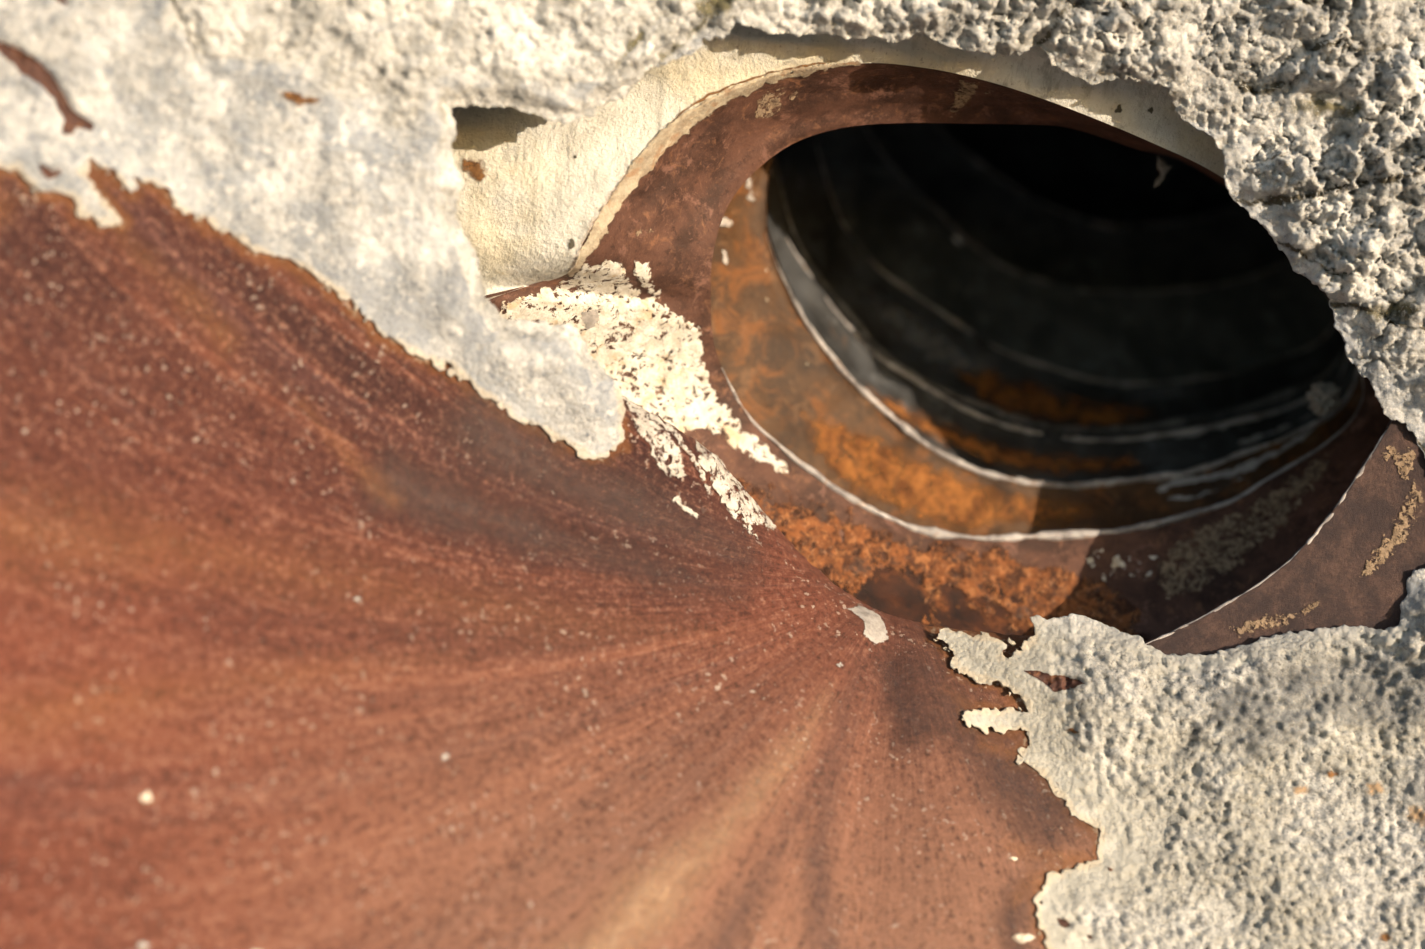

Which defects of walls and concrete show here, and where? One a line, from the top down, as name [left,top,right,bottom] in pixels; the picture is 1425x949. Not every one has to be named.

spalling [0,42,94,134]
rust [670,61,829,124]
peeling [755,88,798,118]
spalling [39,164,62,179]
peeling [499,259,788,540]
rust [882,398,1133,475]
rust [812,422,1084,527]
rust [739,478,1148,641]
peeling [848,604,889,644]
spalling [1025,670,1085,692]
peeling [1012,933,1035,943]